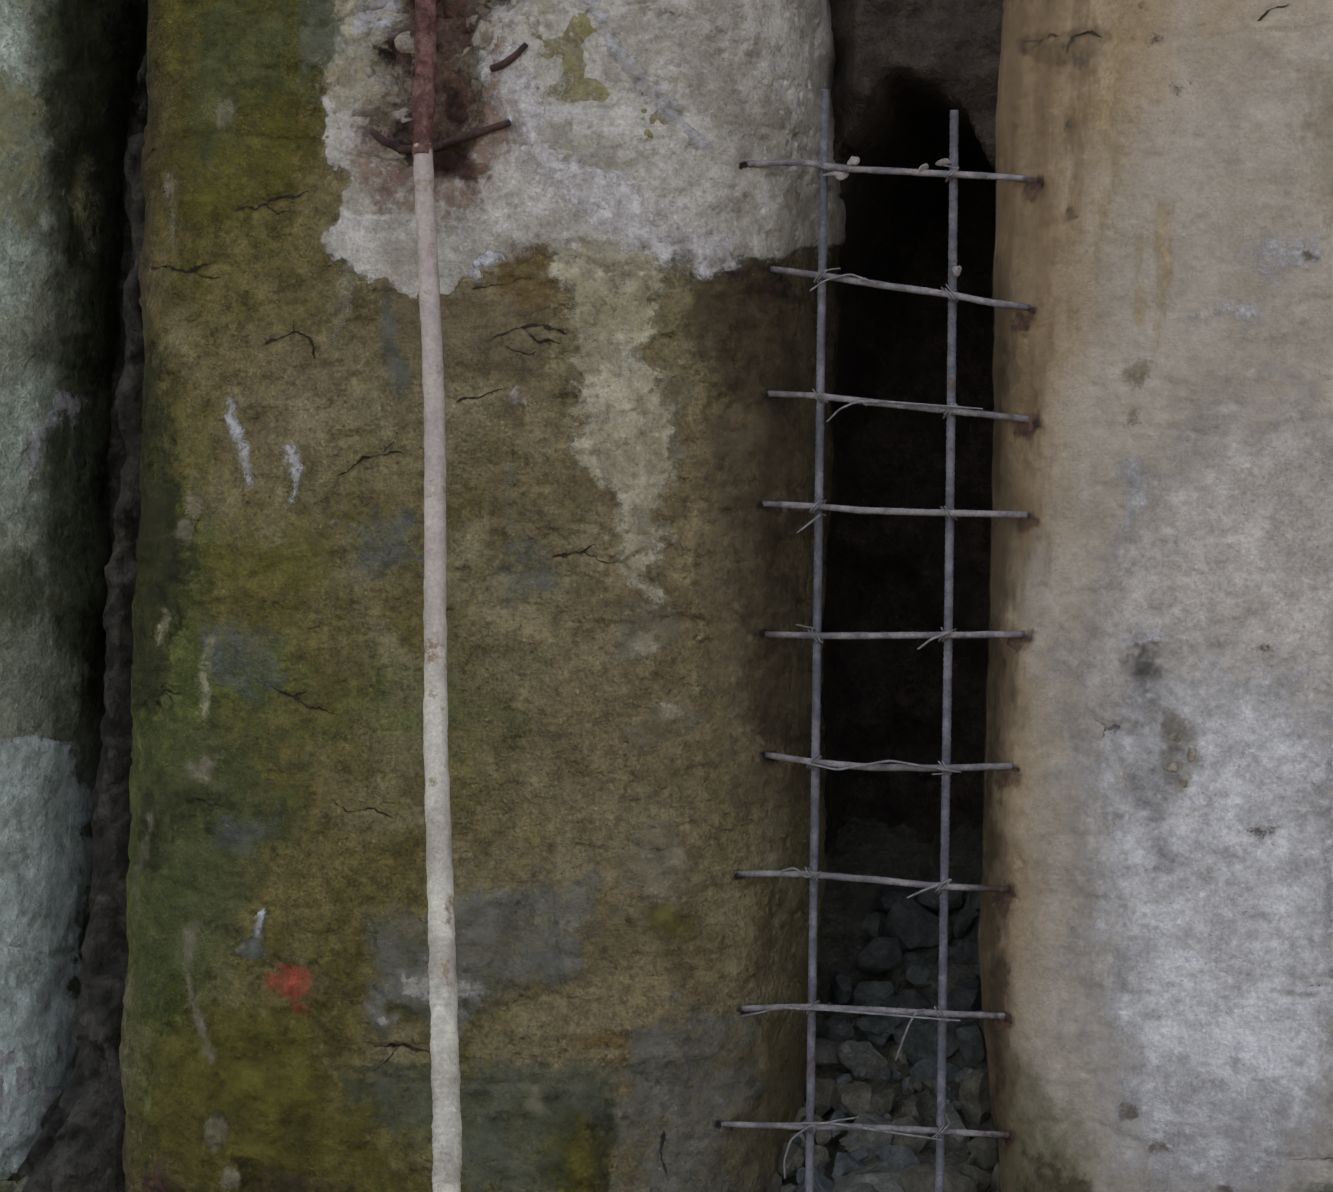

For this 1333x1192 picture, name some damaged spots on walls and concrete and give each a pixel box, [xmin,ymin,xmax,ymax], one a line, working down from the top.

spalling [489,42,528,72]
rust [412,0,438,158]
spalling [369,128,413,153]
spalling [433,119,511,152]